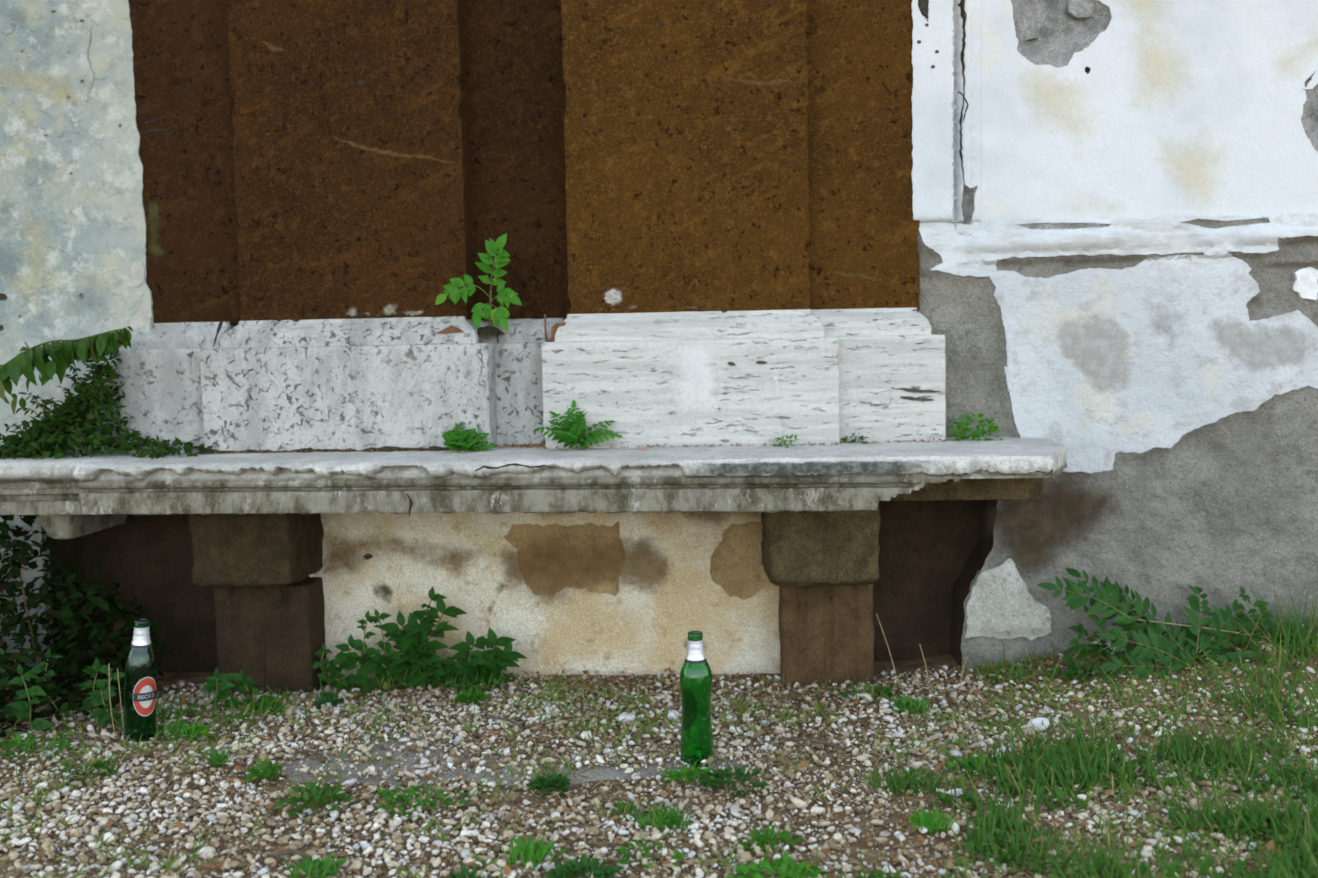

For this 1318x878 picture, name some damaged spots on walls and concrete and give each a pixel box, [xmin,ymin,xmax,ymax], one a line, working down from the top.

flaking render [1011,0,1111,68]
crack [919,0,969,185]
flaking render [1301,69,1318,152]
peeling [1180,218,1270,229]
flaking render [1227,236,1318,327]
flaking render [961,386,1318,669]